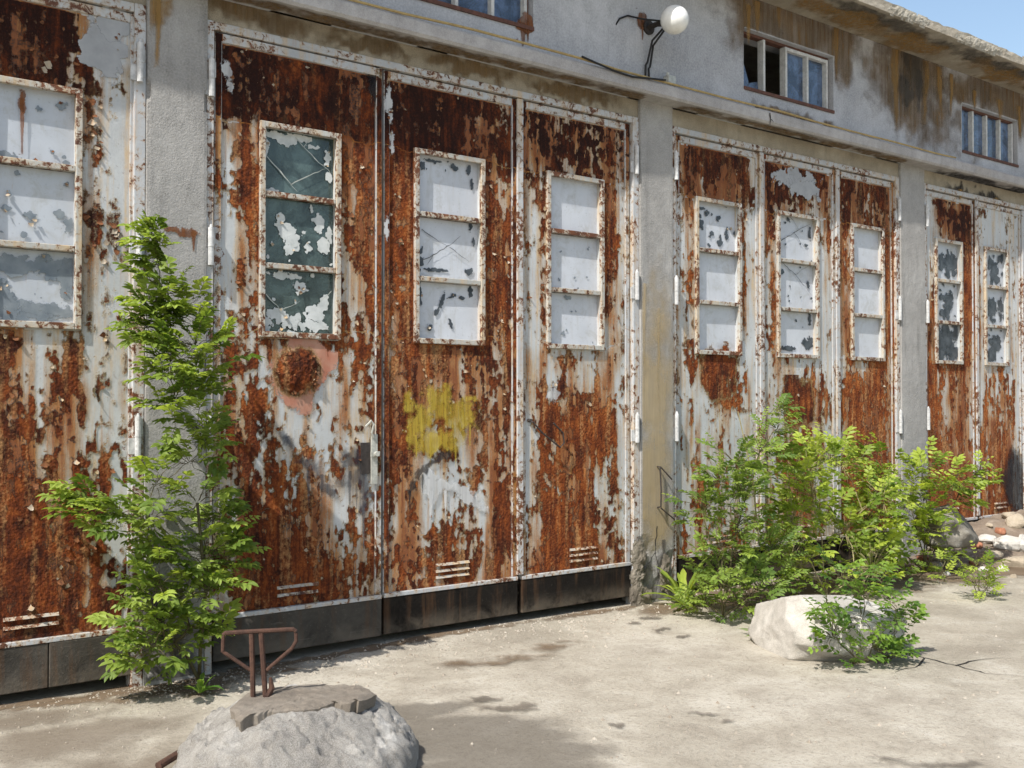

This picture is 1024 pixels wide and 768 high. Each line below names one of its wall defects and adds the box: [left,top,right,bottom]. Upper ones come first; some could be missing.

peeling [221,61,235,92]
peeling [266,129,332,183]
leakage [732,0,1024,141]
rust [0,0,131,643]
peeling [265,205,338,415]
rust [213,32,630,612]
peeling [547,383,559,402]
rust [676,135,895,555]
rust [927,198,1020,518]
crack [896,651,1024,677]